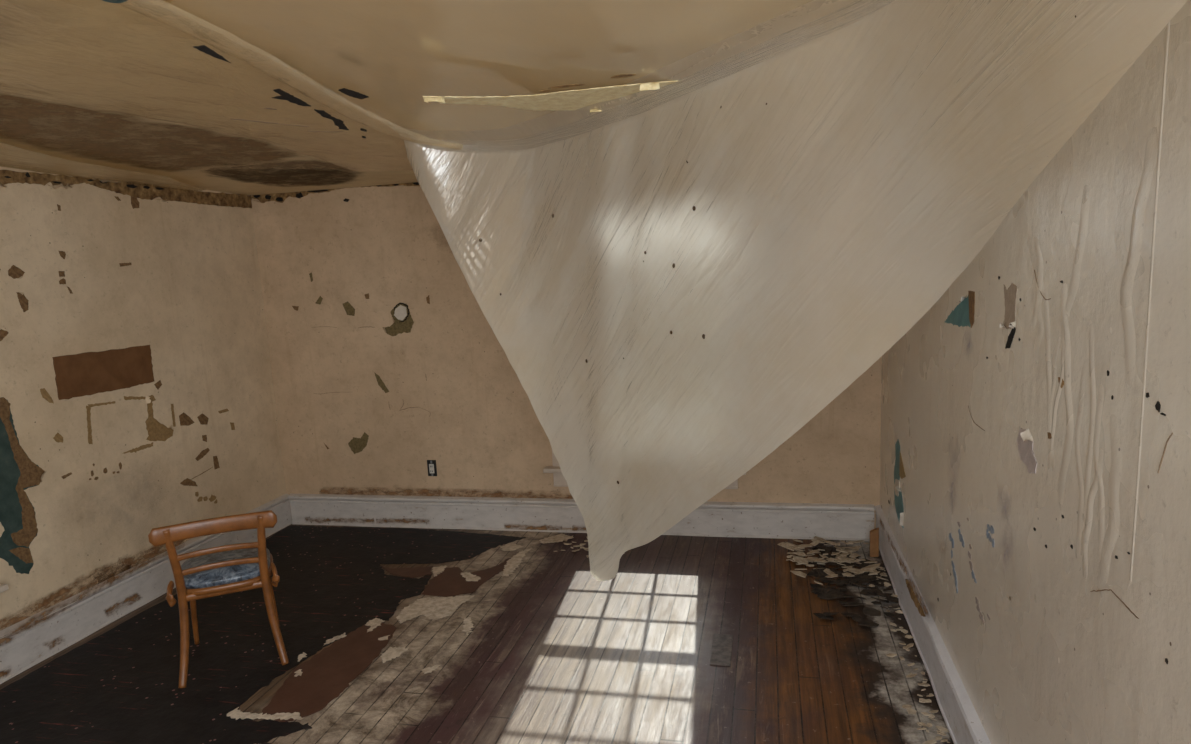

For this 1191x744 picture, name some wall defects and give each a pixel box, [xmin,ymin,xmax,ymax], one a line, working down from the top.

water stain [0,94,354,187]
peeling [0,170,420,209]
peeling [0,265,29,312]
peeling [59,251,73,294]
peeling [383,303,414,336]
peeling [944,291,975,328]
peeling [998,276,1021,349]
peeling [145,380,235,469]
peeling [347,432,369,454]
peeling [1017,428,1037,474]
peeling [0,397,46,574]
peeling [888,440,906,528]